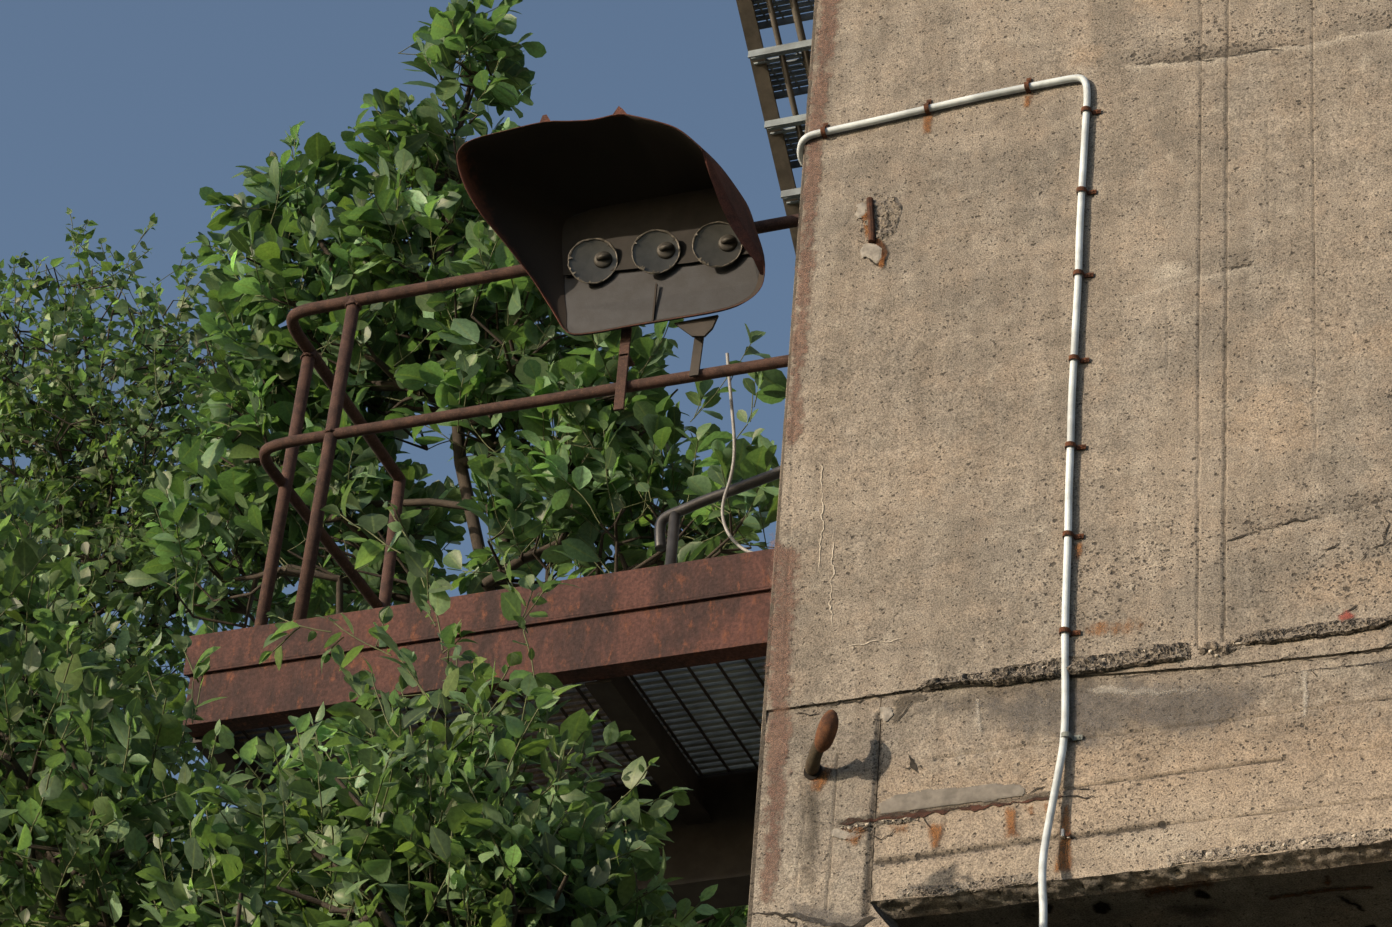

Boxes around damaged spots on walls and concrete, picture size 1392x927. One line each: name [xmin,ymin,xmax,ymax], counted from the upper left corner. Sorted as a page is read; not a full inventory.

crack [1193,49,1279,61]
crack [1227,510,1392,564]
spalling [880,615,1392,724]
rust [831,783,1071,871]